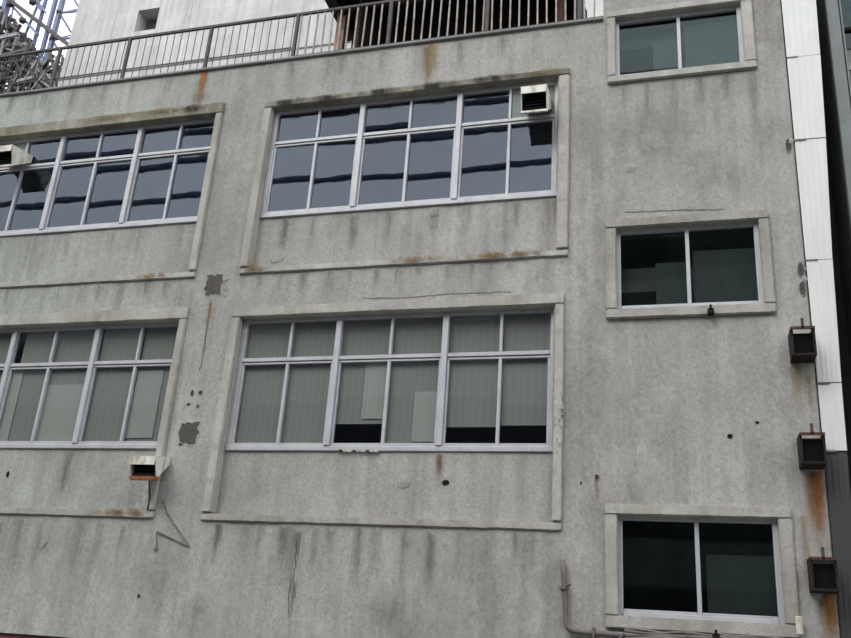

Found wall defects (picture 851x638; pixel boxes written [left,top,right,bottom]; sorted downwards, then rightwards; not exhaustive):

spalling [202,272,225,299]
spalling [177,420,202,447]
corrosion [807,471,823,516]
crack [288,540,297,616]
corrosion [821,594,835,628]